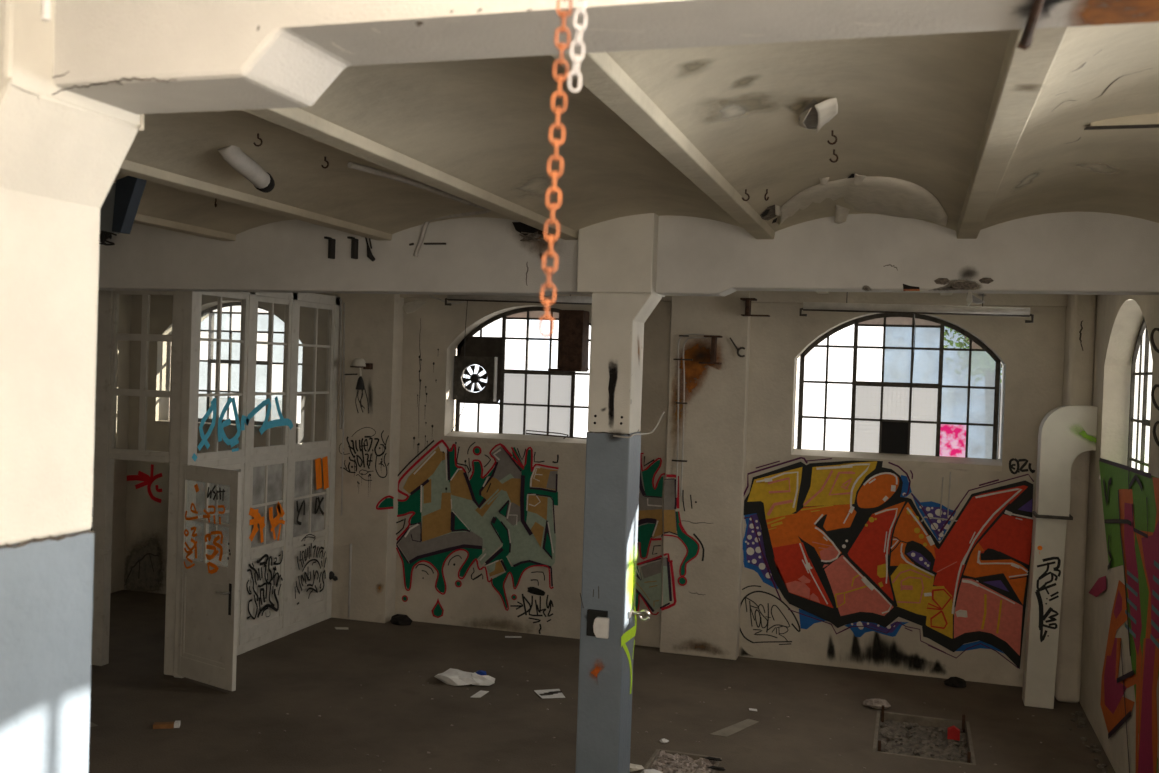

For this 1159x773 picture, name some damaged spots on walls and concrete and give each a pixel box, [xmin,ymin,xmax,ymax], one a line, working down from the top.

rust [1077,0,1159,26]
crack [12,71,178,99]
crack [1051,50,1159,144]
rust [674,341,720,425]